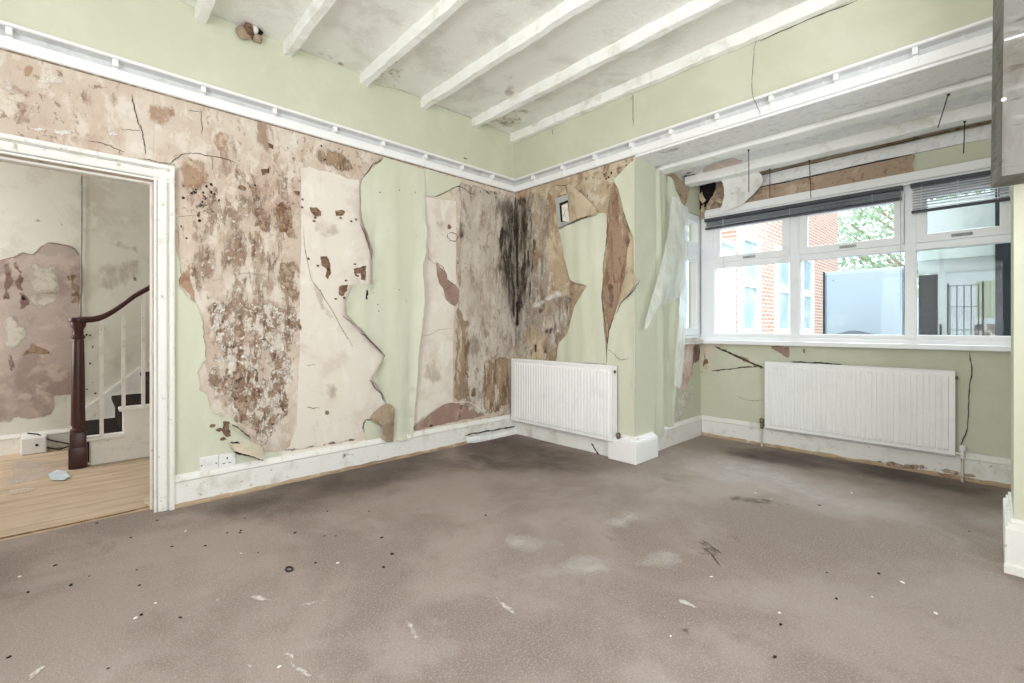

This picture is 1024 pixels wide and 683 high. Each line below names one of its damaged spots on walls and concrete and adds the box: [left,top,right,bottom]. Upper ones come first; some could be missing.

crack [87,97,238,169]
flaking render [745,120,991,203]
flaking render [294,191,321,222]
flaking render [700,158,743,219]
flaking render [307,256,331,279]
flaking render [334,263,366,300]
flaking render [431,261,460,306]
damp [454,182,572,414]
flaking render [0,242,83,422]
flaking render [677,344,763,392]
flaking render [222,421,231,437]
flaking render [413,402,485,430]